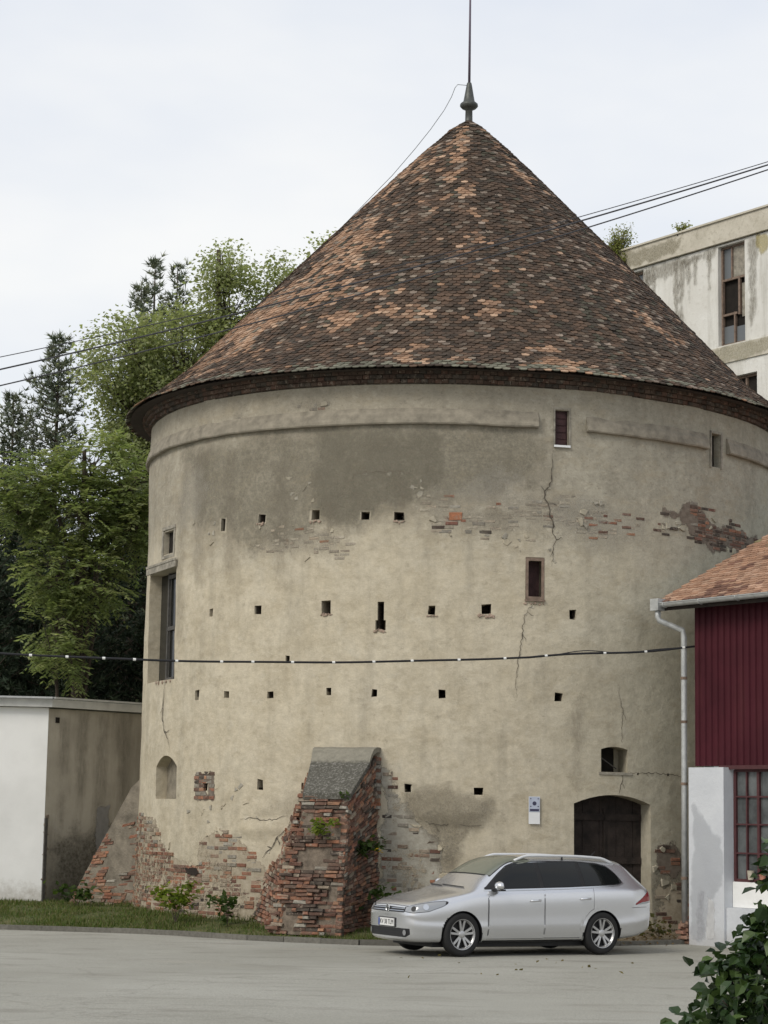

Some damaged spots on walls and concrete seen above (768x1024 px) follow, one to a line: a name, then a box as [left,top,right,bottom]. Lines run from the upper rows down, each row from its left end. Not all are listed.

flaking render [253,519,355,562]
crack [543,454,563,563]
flaking render [409,479,758,554]
crack [515,604,534,694]
flaking render [132,769,266,920]
flaking render [652,842,689,932]